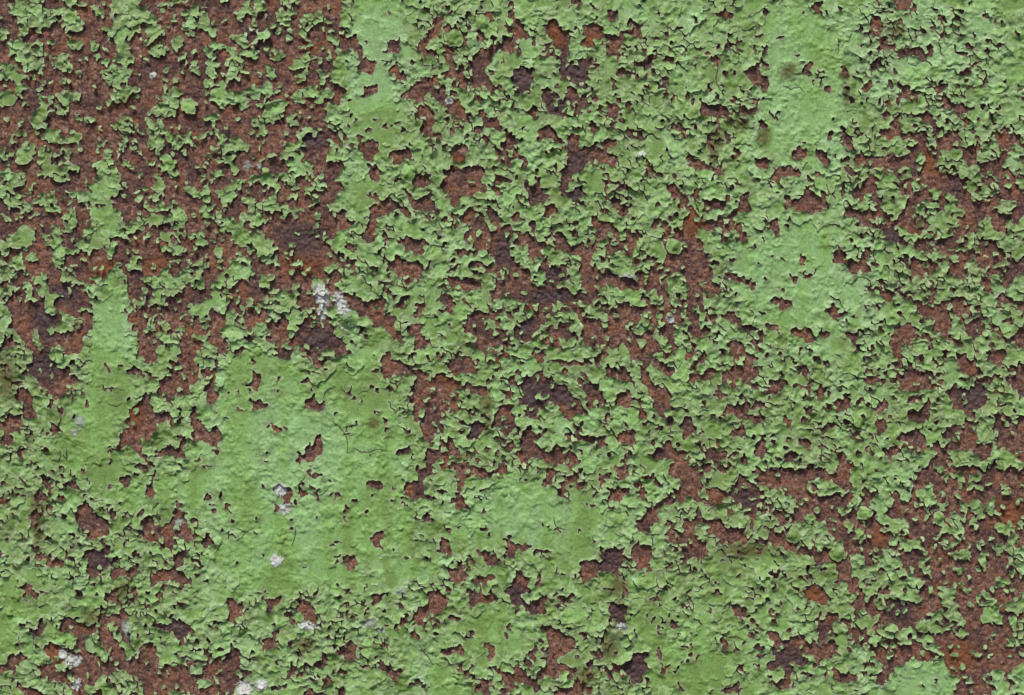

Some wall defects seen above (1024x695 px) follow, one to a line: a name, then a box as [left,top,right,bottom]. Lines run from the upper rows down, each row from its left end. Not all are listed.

peeling [840,0,965,105]
peeling [754,157,836,215]
corrosion [686,210,703,230]
corrosion [95,262,114,280]
corrosion [437,371,458,385]
corrosion [127,404,142,423]
corrosion [999,501,1022,525]
peeling [0,448,255,695]
peeling [382,525,575,639]
corrosion [47,643,63,660]
peeling [207,589,348,695]
peeling [440,619,653,695]